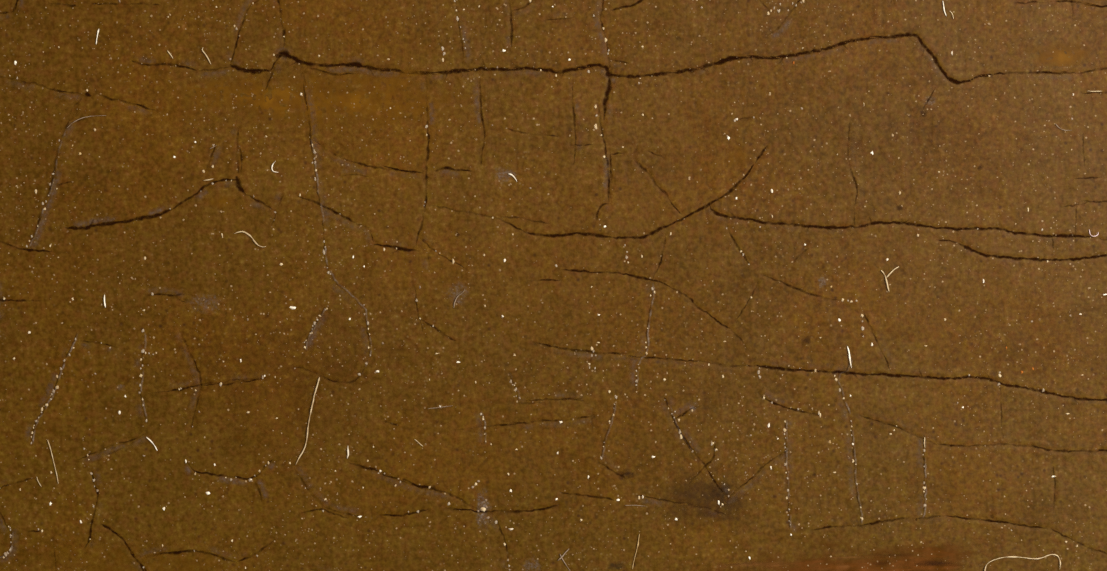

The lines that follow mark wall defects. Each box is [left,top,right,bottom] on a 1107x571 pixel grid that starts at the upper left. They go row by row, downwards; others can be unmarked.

crack [10,169,58,252]
crack [68,144,276,230]
crack [231,0,1107,571]
crack [31,336,111,444]
crack [132,329,157,440]
crack [172,361,264,391]
crack [83,448,270,571]